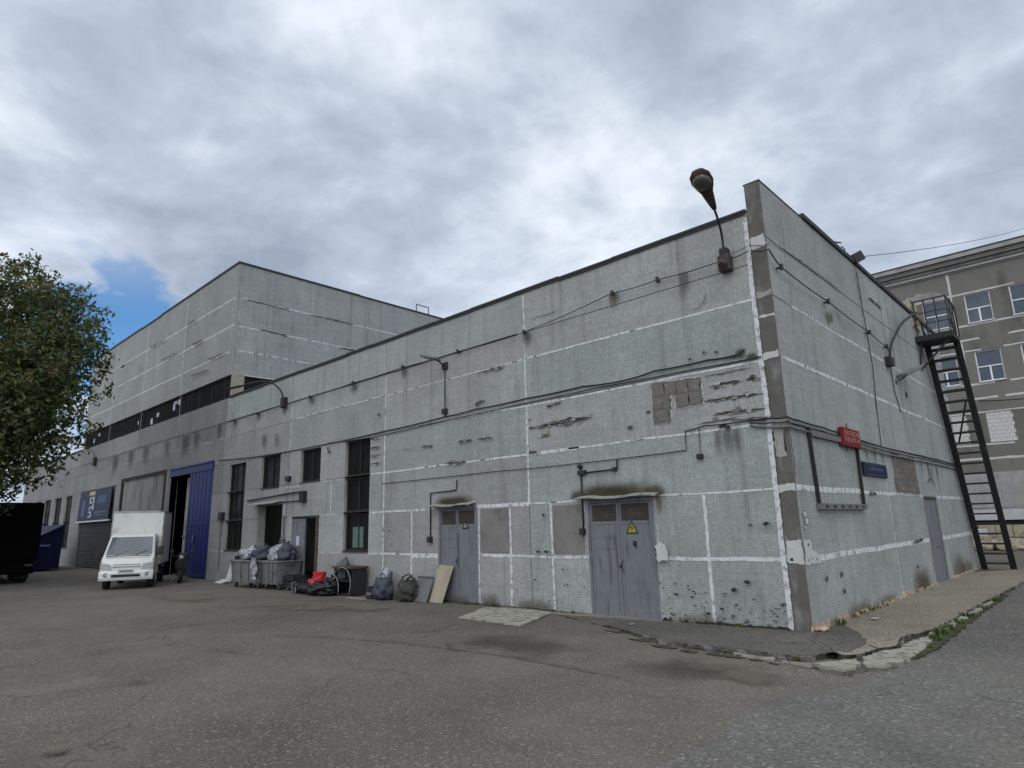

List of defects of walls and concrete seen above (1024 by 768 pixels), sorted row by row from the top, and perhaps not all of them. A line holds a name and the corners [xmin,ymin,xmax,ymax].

spalling [529,414,593,437]
peeling [646,375,787,457]
peeling [786,512,822,565]
peeling [659,580,789,628]